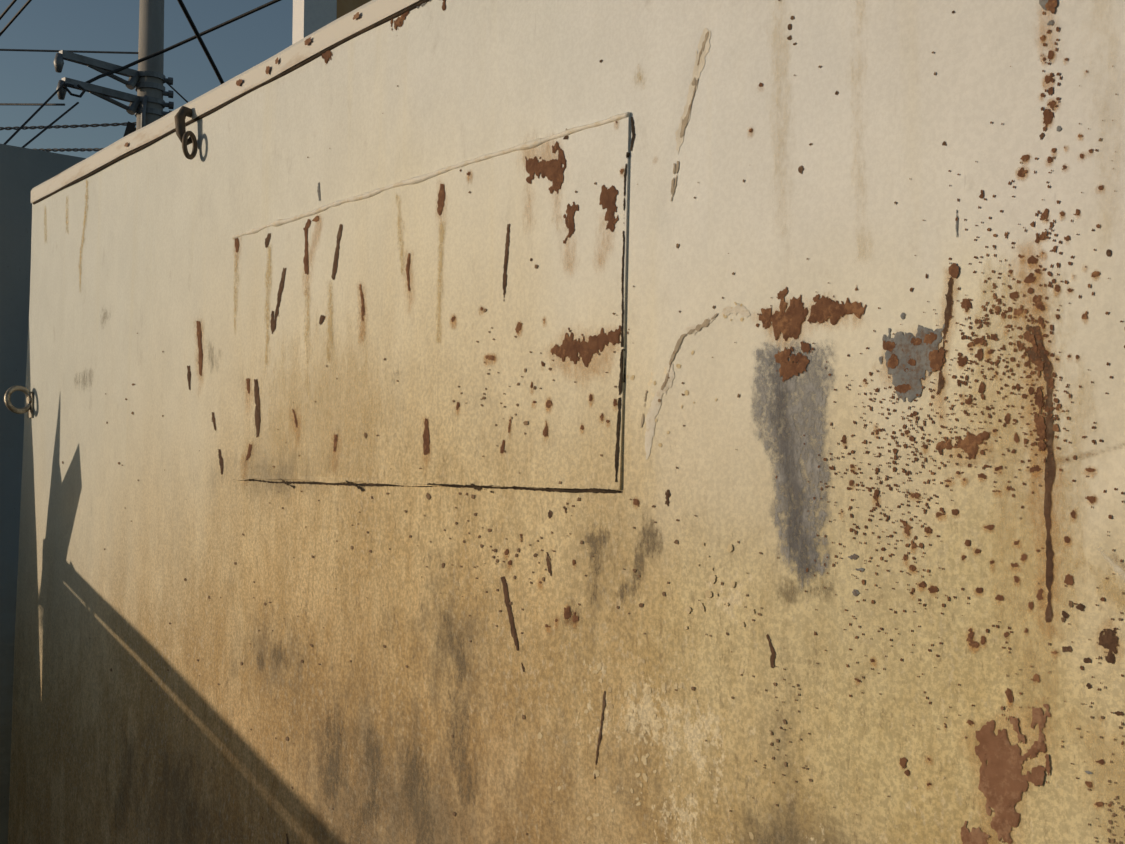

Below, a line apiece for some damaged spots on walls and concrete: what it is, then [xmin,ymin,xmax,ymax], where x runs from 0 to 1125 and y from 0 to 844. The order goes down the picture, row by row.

corrosion [1039,0,1068,140]
corrosion [525,129,568,194]
corrosion [594,182,618,232]
corrosion [529,313,629,381]
corrosion [756,282,879,382]
damp [775,387,814,577]
corrosion [806,146,1109,697]
corrosion [1061,549,1122,625]
corrosion [754,654,812,784]
corrosion [937,666,1051,844]